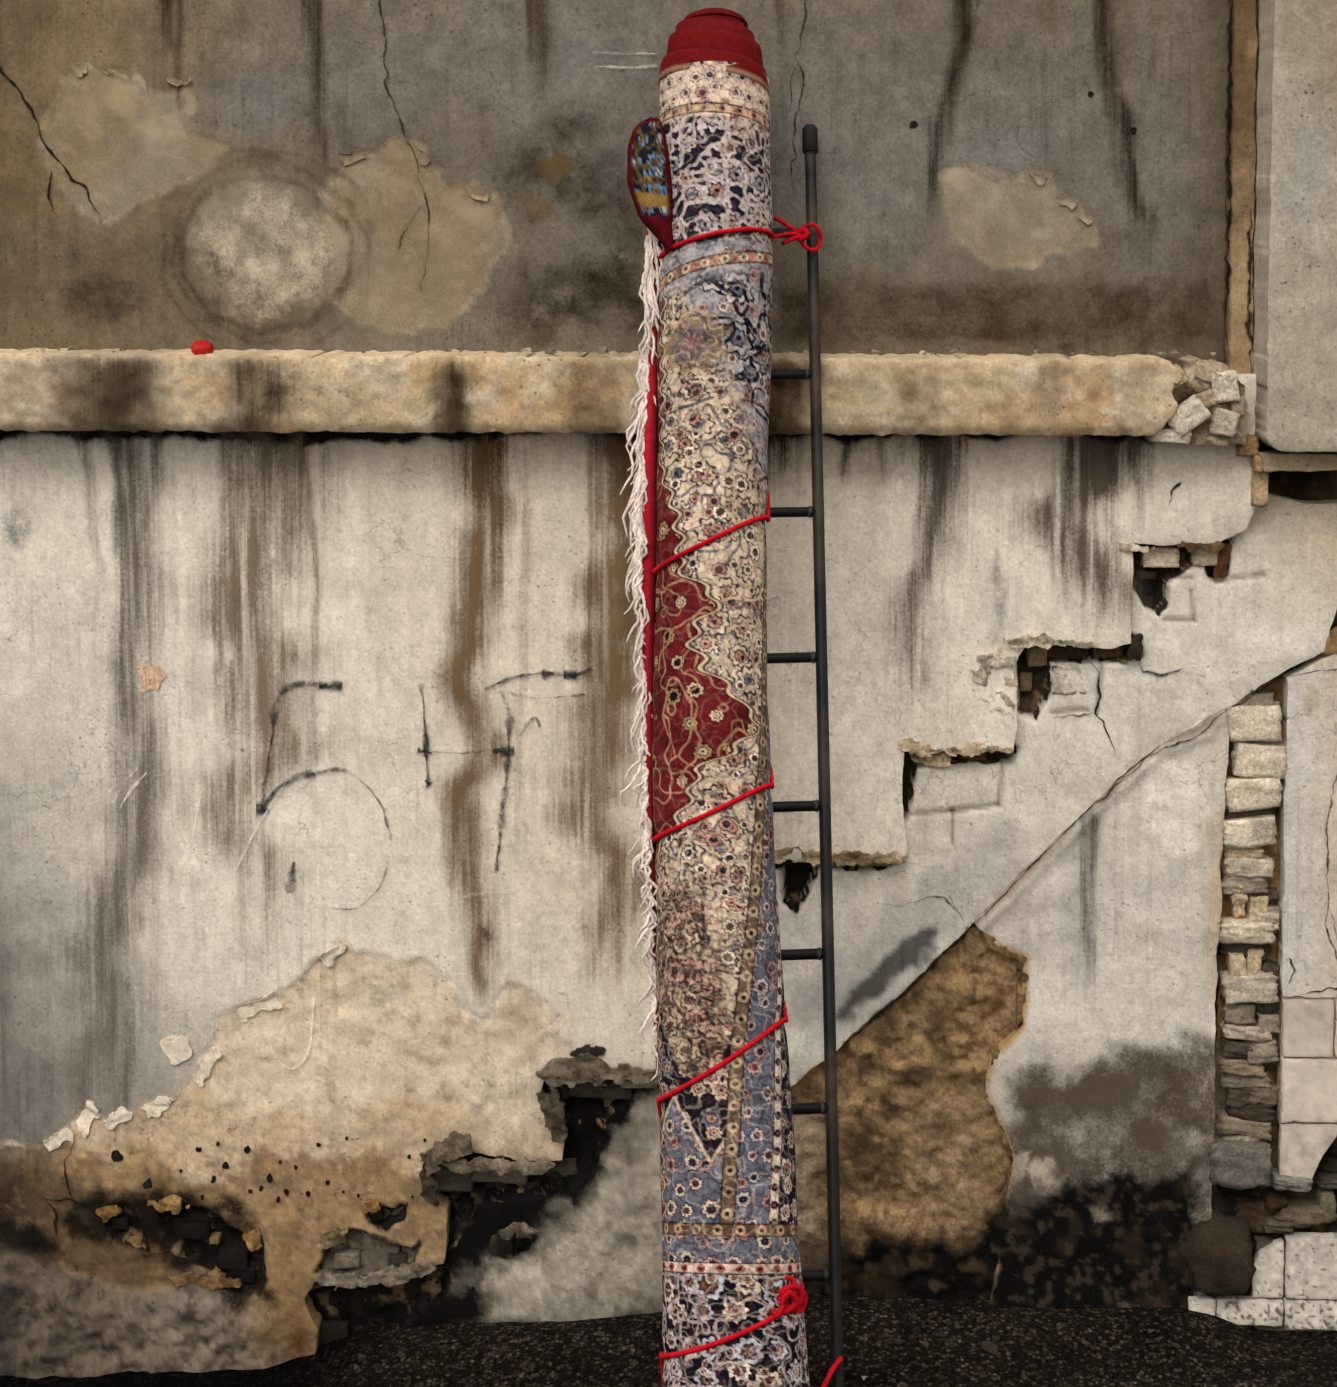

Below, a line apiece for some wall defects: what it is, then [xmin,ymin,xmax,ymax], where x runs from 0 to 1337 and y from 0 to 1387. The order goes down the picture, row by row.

crack [0,67,101,222]
crack [378,0,430,289]
water stain [0,359,543,1109]
water stain [558,433,647,963]
water stain [767,419,894,474]
flaking render [971,633,1144,720]
crack [846,662,1337,1043]
flaking render [1113,539,1232,616]
flaking render [1268,470,1337,501]
flaking render [307,1015,659,1345]
flaking render [791,922,1029,1294]
water stain [1008,1032,1223,1225]